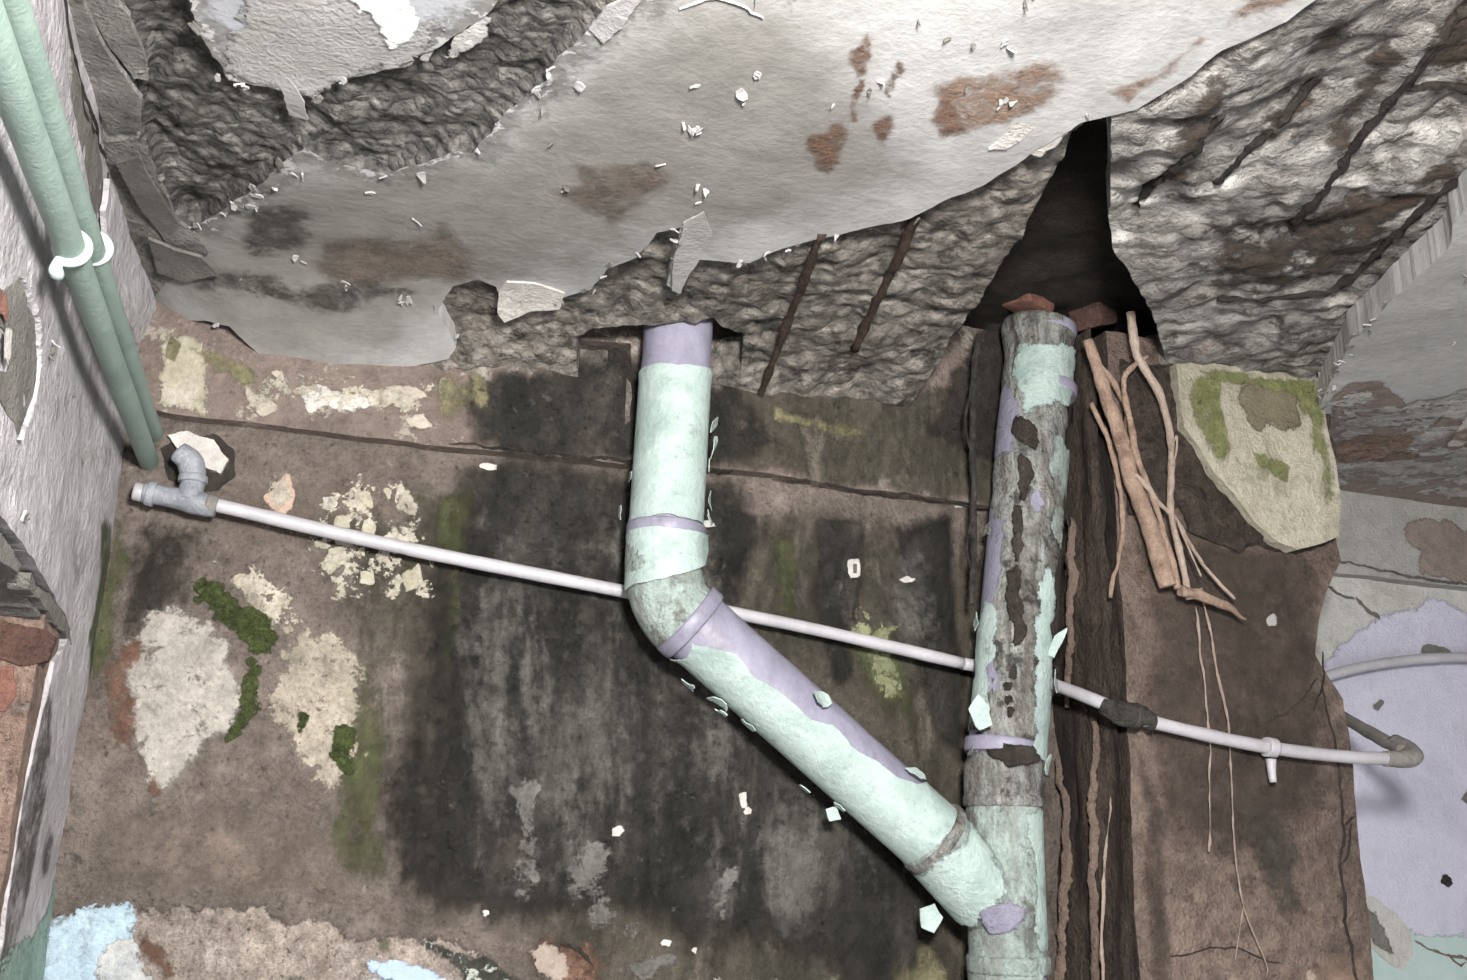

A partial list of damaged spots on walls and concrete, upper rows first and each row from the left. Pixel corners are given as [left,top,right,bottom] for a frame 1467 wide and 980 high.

corrosion [807,38,893,171]
corrosion [933,65,1061,136]
spalling [68,0,641,417]
spalling [0,276,62,441]
spalling [386,0,1467,593]
water stain [1204,369,1334,504]
water stain [701,323,1004,812]
water stain [106,528,242,795]
water stain [230,346,969,980]
peeling [129,902,479,980]
spalling [1366,895,1413,970]
crack [1415,940,1467,967]